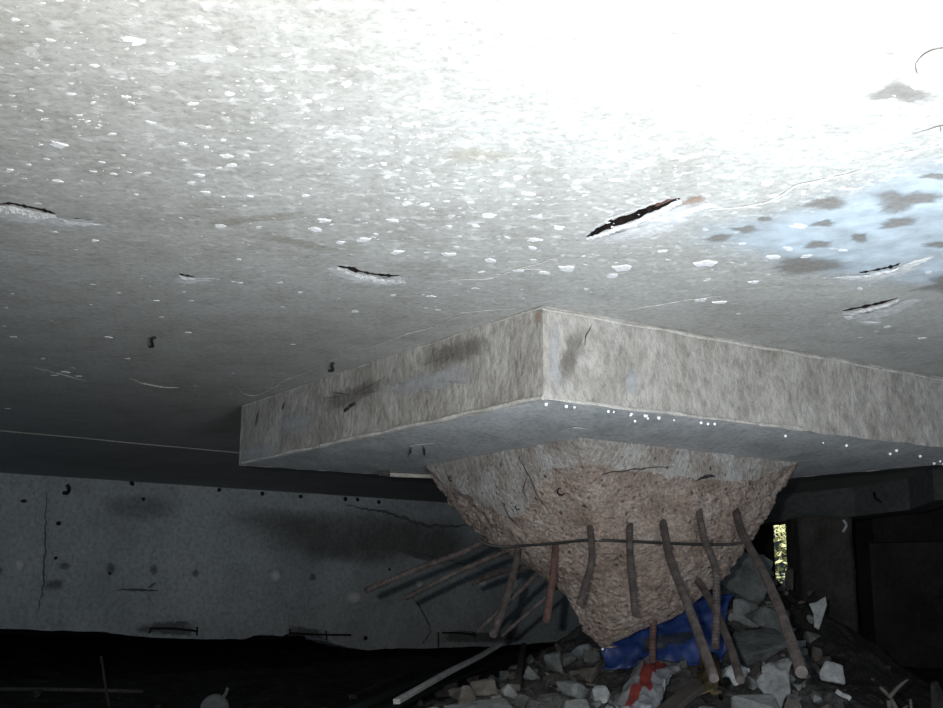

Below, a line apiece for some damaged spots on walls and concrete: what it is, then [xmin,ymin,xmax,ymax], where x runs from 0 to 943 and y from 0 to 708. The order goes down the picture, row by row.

spalling [0,202,102,233]
spalling [326,266,405,297]
peeling [606,265,632,278]
spalling [586,145,941,240]
peeling [708,170,943,328]
crack [20,492,47,611]
spalling [576,525,595,607]
spalling [626,522,640,618]
spalling [660,508,745,684]
spalling [733,508,808,678]